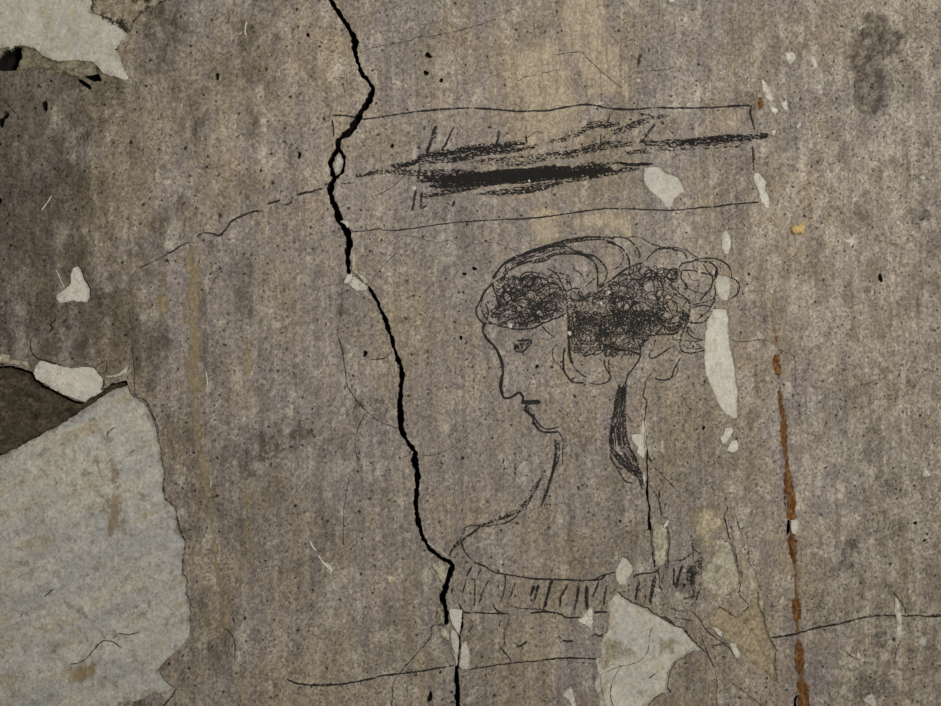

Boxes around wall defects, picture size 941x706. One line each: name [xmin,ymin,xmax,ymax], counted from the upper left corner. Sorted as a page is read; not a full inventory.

flaking render [0,0,166,90]
flaking render [644,166,685,207]
flaking render [57,265,91,303]
crack [323,0,521,706]
flaking render [704,275,739,453]
flaking render [0,353,192,706]
corrosion [771,300,811,706]
flaking render [595,556,704,706]